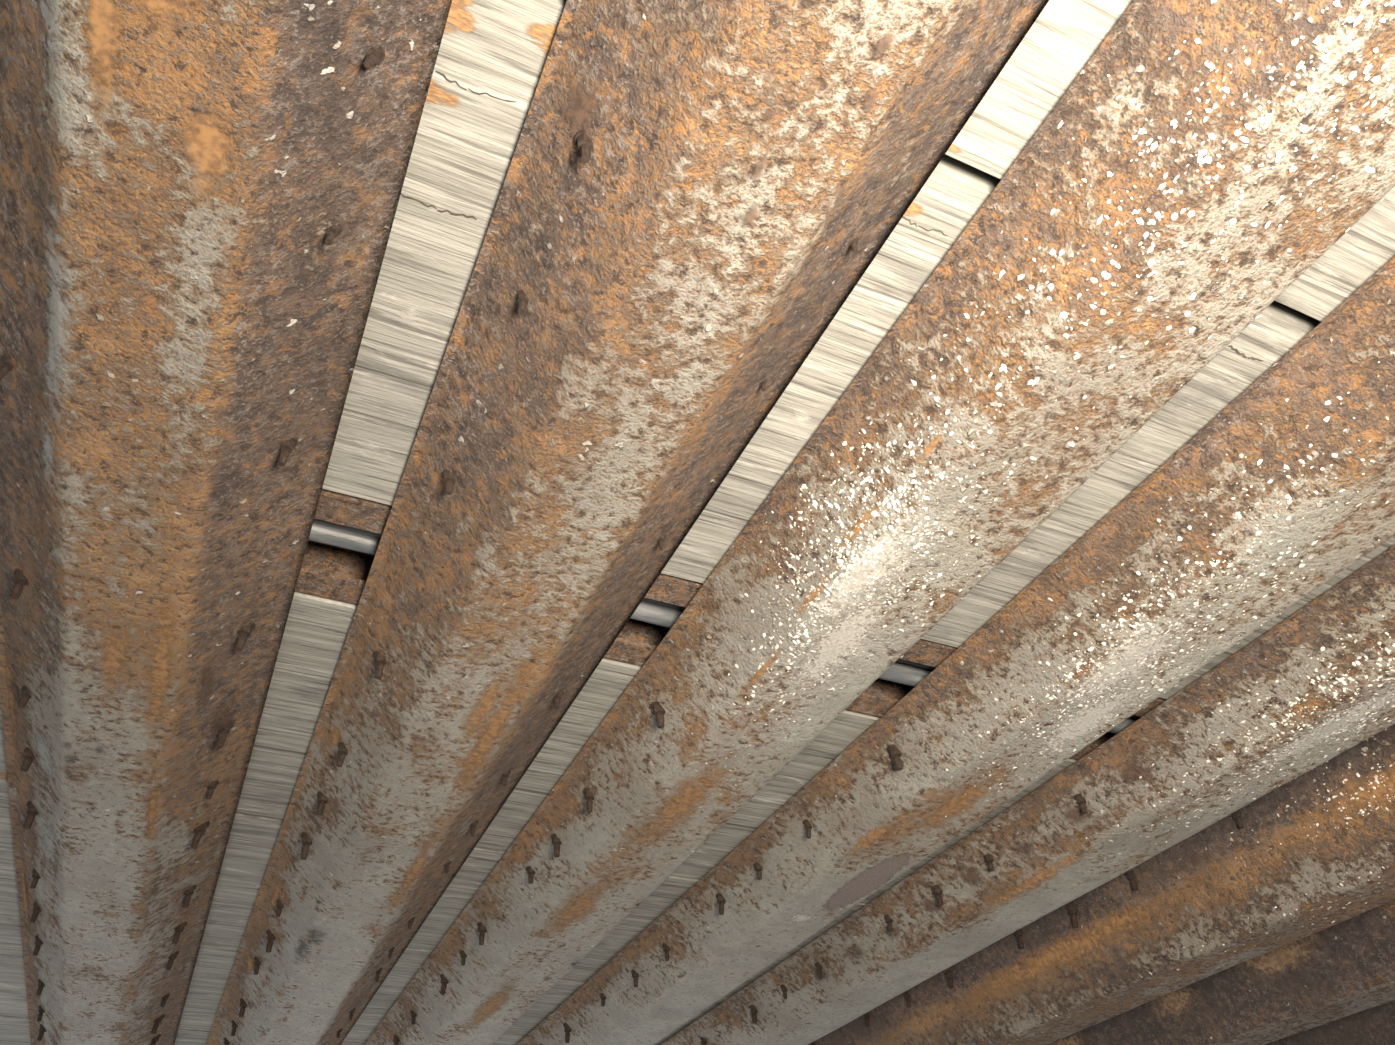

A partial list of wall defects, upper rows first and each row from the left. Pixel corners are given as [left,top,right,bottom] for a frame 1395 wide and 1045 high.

rust [145,0,187,16]
rust [445,0,477,32]
rust [88,0,119,101]
rust [426,80,458,106]
rust [187,118,228,194]
rust [842,509,875,546]
rust [456,669,528,786]
rust [1298,766,1395,829]
rust [547,881,609,936]
rust [952,907,1148,1007]
rust [1245,935,1313,973]
rust [466,986,511,1029]